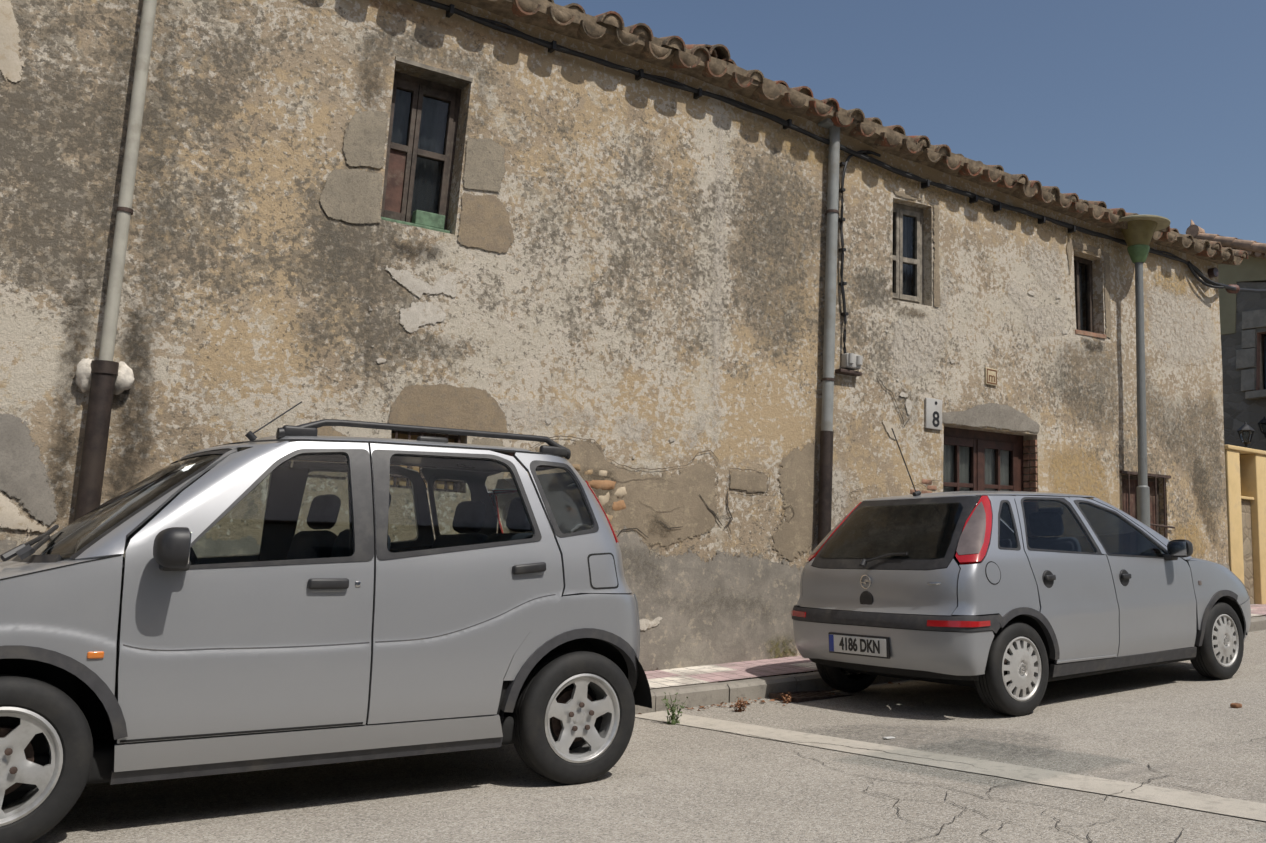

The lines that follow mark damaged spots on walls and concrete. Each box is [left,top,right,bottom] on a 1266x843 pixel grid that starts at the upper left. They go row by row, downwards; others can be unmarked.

leakage [62,283,89,406]
leakage [669,120,1114,447]
flaking render [0,493,47,533]
leakage [51,427,74,514]
leakage [110,325,151,511]
flaking render [527,436,819,561]
crack [699,491,733,533]